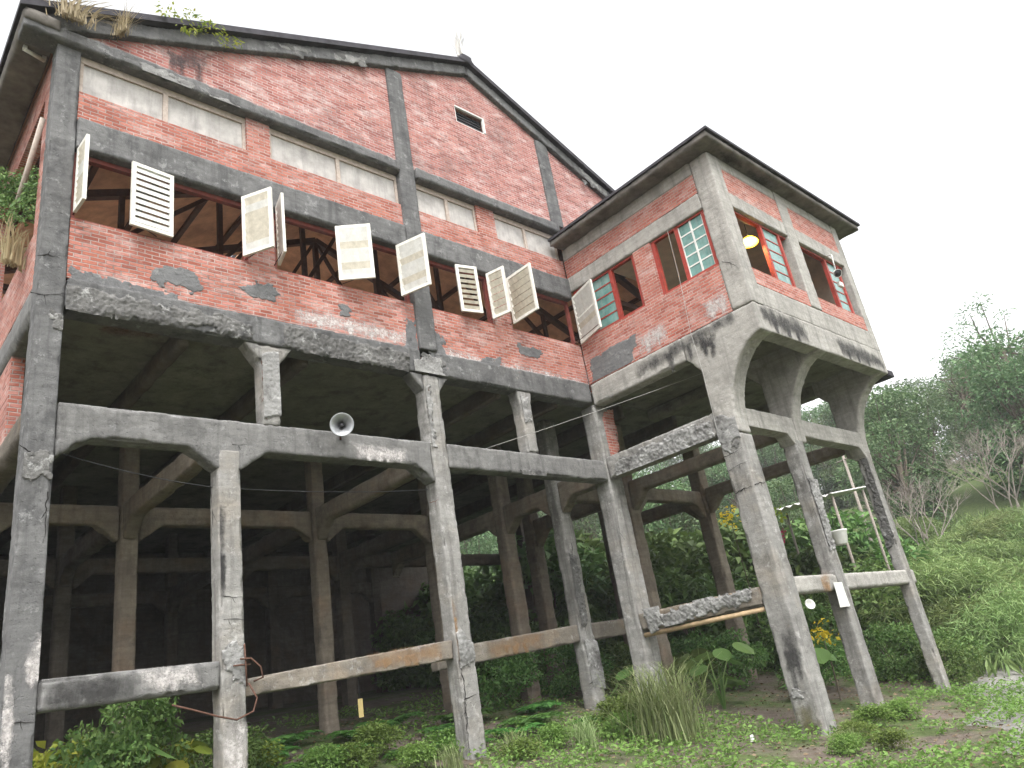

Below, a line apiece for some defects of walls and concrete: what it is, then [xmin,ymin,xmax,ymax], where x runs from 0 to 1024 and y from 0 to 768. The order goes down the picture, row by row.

spalling [48,278,255,341]
damp [761,307,808,341]
spalling [22,450,54,482]
spalling [660,587,752,627]
damp [782,637,803,689]
crack [459,657,476,758]